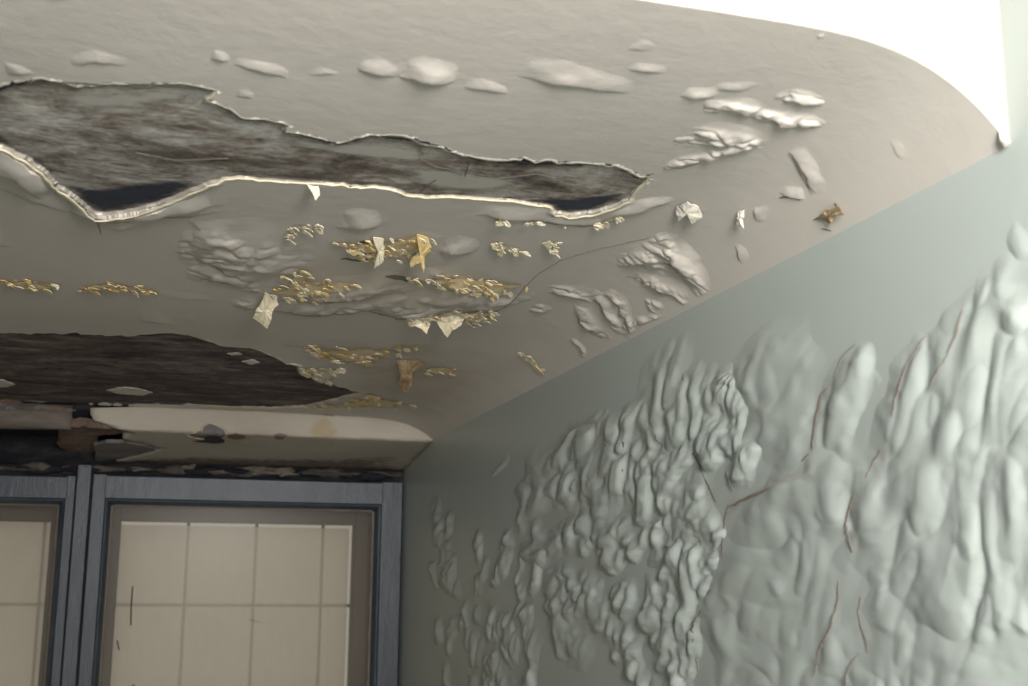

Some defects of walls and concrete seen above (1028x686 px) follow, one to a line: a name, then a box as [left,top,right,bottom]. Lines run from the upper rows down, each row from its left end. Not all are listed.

peeling [0,77,655,231]
peeling [253,270,362,328]
peeling [284,224,531,338]
peeling [542,241,563,258]
peeling [0,332,457,481]